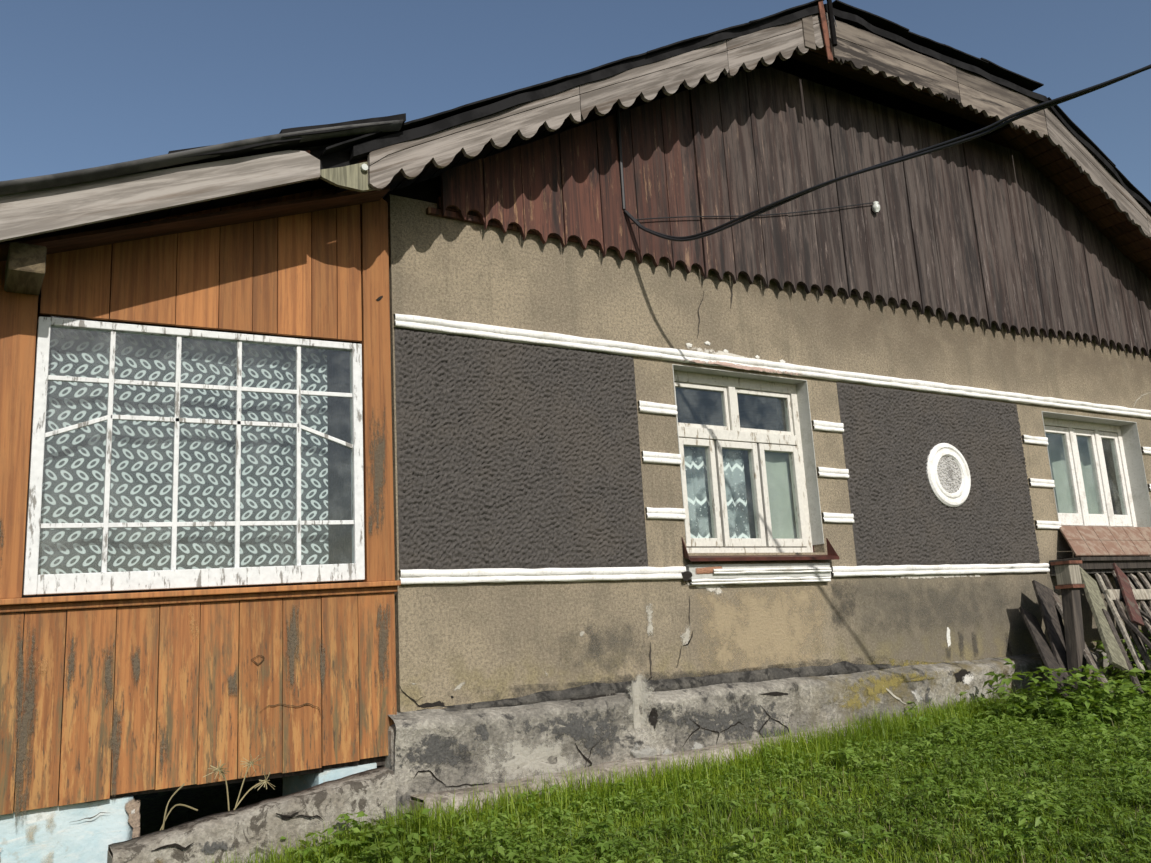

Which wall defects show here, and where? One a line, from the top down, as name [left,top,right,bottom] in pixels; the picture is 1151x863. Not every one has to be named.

damp [516,606,830,694]
crack [682,705,789,747]
crack [276,812,323,820]
crack [151,842,194,852]